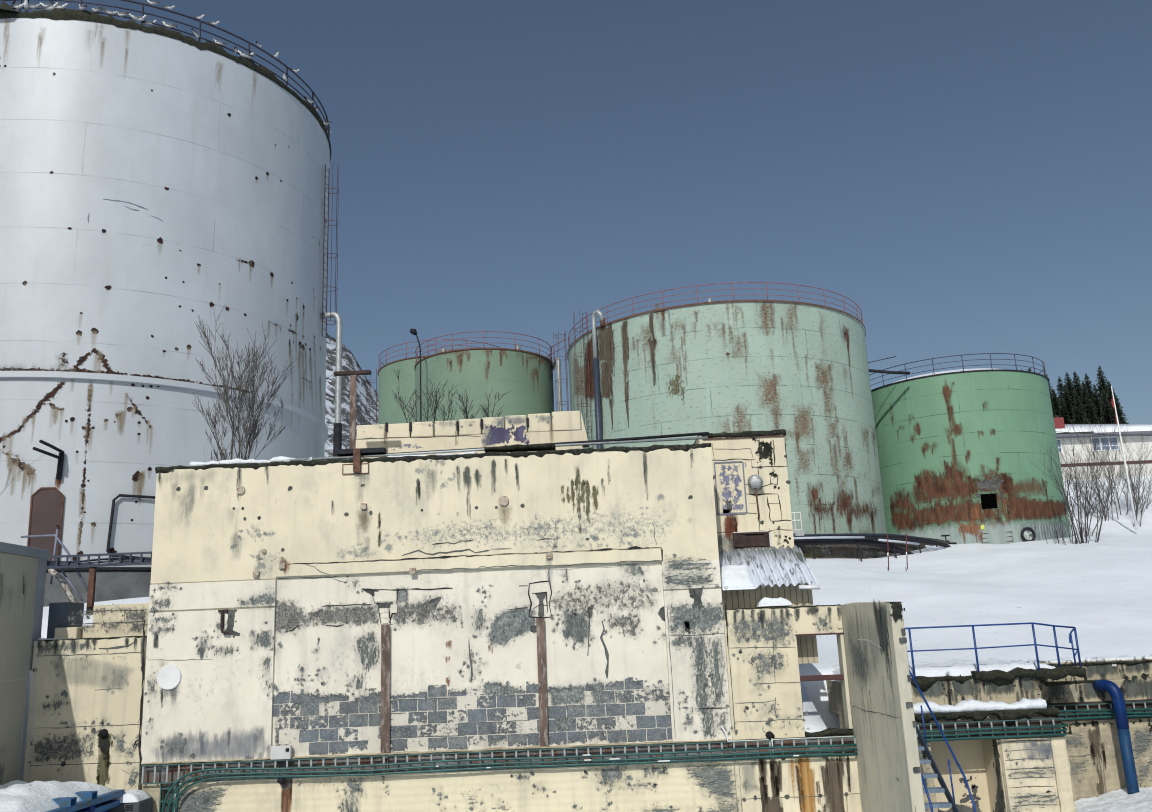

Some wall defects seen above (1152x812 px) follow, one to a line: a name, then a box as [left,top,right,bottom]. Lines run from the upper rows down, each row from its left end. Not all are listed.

corrosion [574,305,685,434]
corrosion [0,348,247,561]
damp [561,474,609,523]
corrosion [760,303,876,534]
corrosion [890,386,1067,544]
peeling [190,516,808,755]
peeling [336,778,363,812]
peeling [582,765,668,810]
peeling [683,761,757,812]
damp [759,755,802,812]
damp [816,756,851,812]
damp [938,739,1005,812]